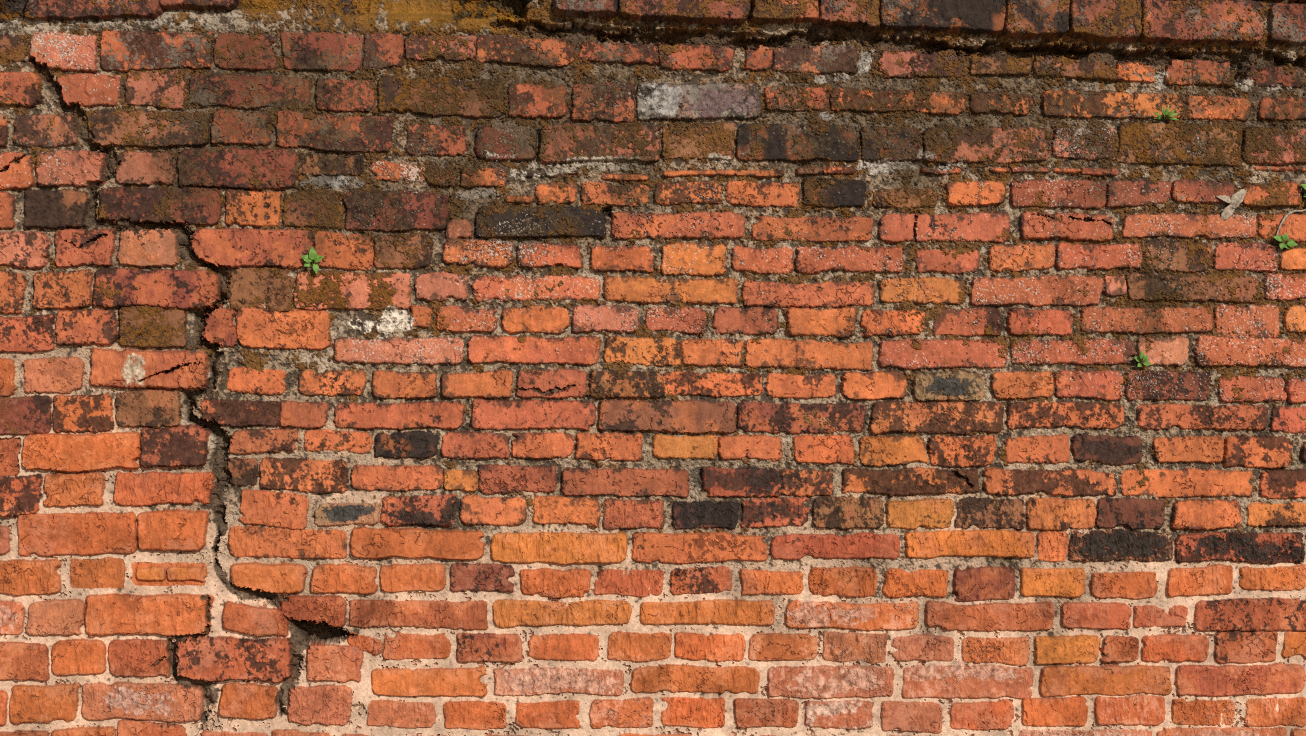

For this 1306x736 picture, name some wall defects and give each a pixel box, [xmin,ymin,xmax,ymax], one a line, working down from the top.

crack [29,57,312,736]